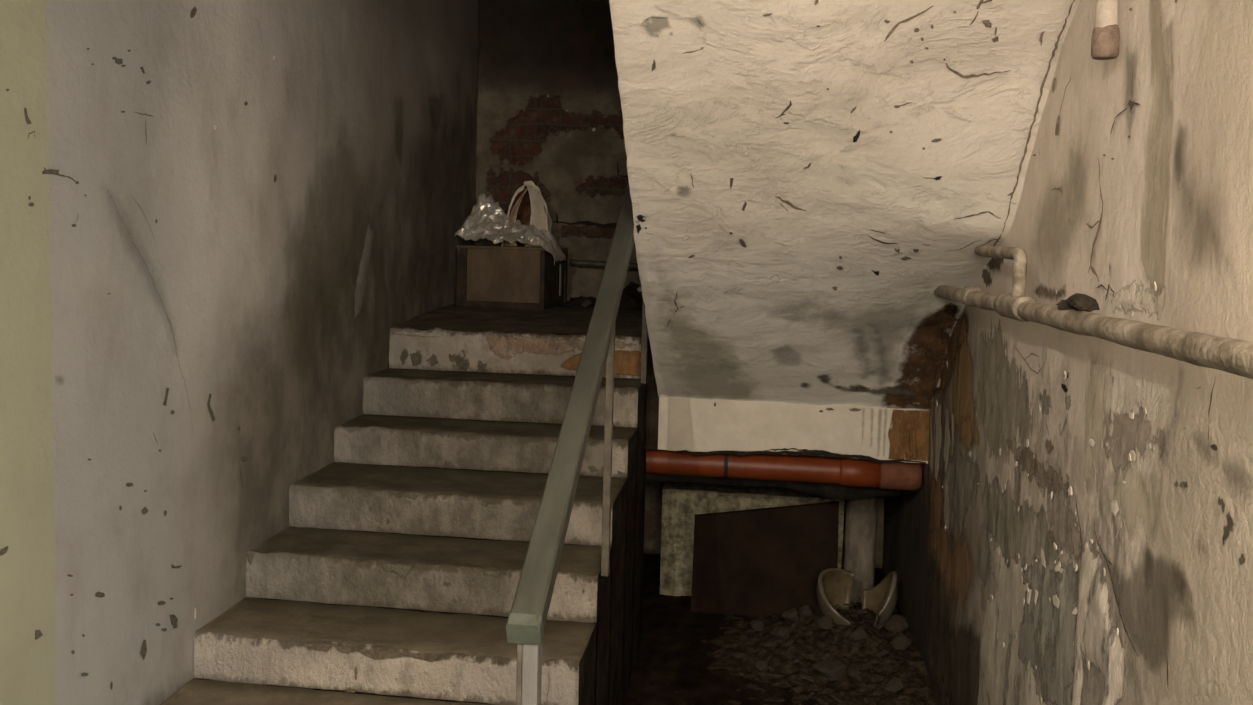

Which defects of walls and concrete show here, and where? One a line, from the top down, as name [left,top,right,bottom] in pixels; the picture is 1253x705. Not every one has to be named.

flaking render [485,95,629,214]
crack [946,0,1075,252]
crack [1051,76,1140,300]
damp [1141,0,1172,291]
peeling [302,643,441,693]
peeling [388,335,584,372]
corrosion [883,303,979,461]
peeling [930,320,1082,705]
crack [1075,497,1168,688]
peeling [1104,405,1165,484]